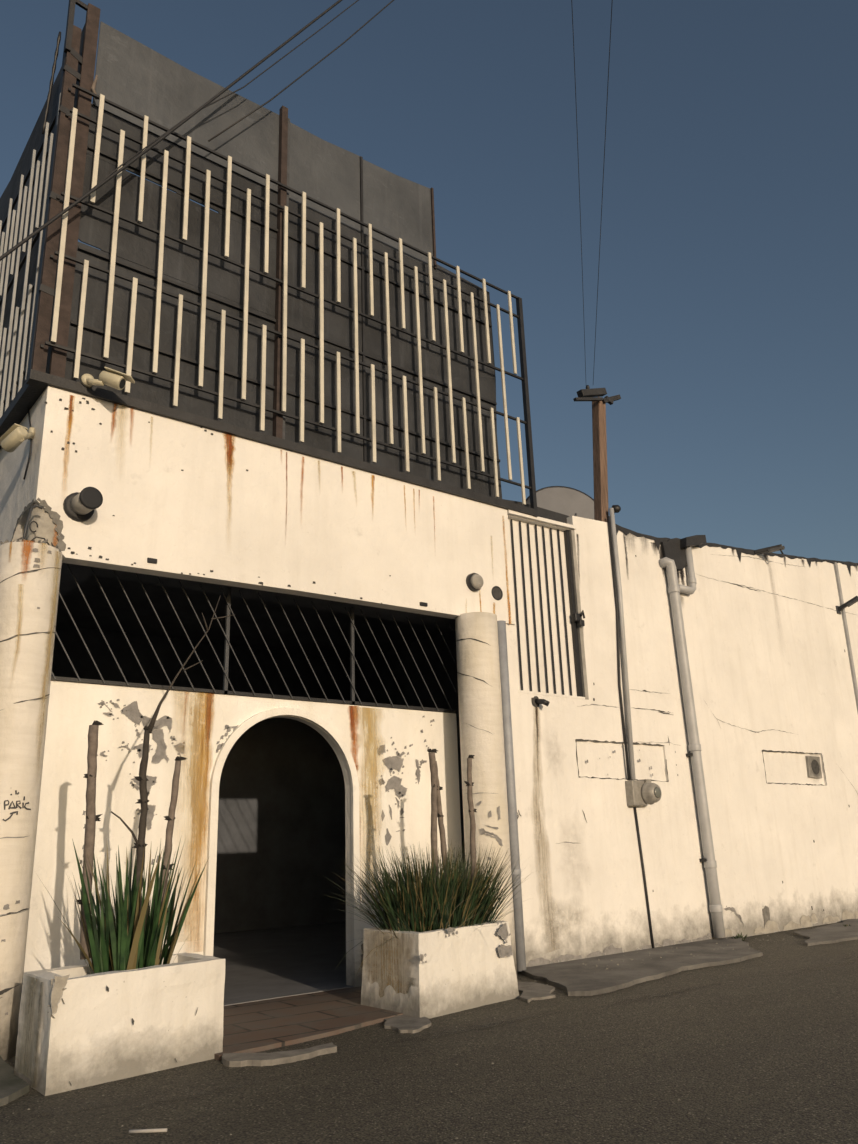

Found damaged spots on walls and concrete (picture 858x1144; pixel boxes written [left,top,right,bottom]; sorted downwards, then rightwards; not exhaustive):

corrosion [226,433,234,475]
spalling [1,498,109,568]
corrosion [10,537,60,698]
peeling [97,699,185,830]
corrosion [189,692,212,909]
corrosion [350,706,378,861]
peeling [376,715,435,852]
peeling [497,921,513,958]